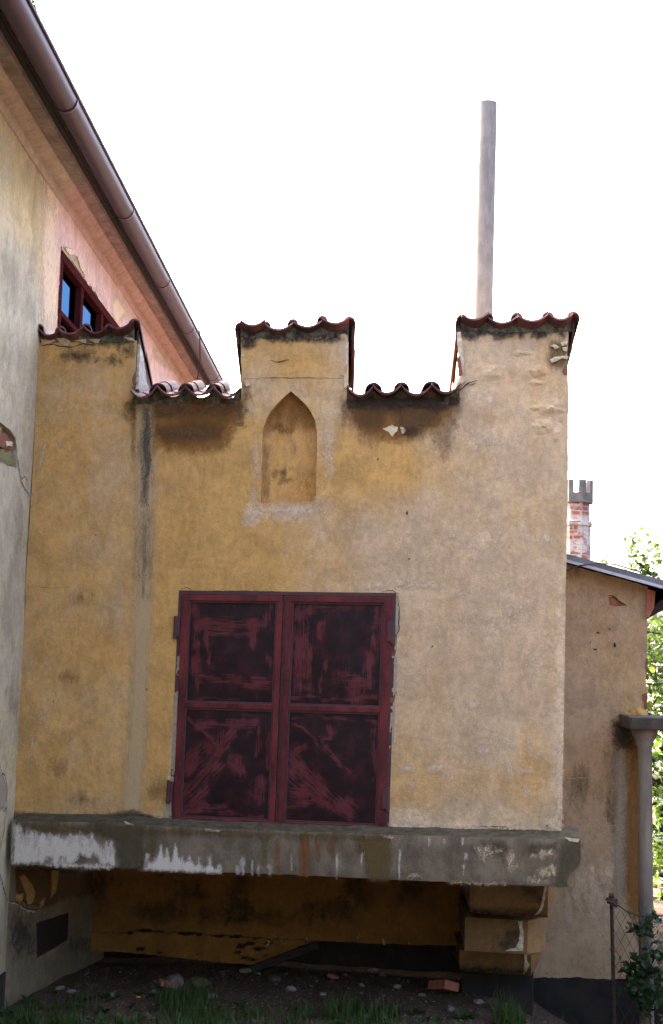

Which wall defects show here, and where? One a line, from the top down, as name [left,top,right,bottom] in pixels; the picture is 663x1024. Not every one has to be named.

spalling [549,341,568,375]
spalling [0,425,16,467]
peeling [383,425,406,436]
water stain [348,396,458,447]
water stain [124,401,254,812]
crack [92,928,320,942]